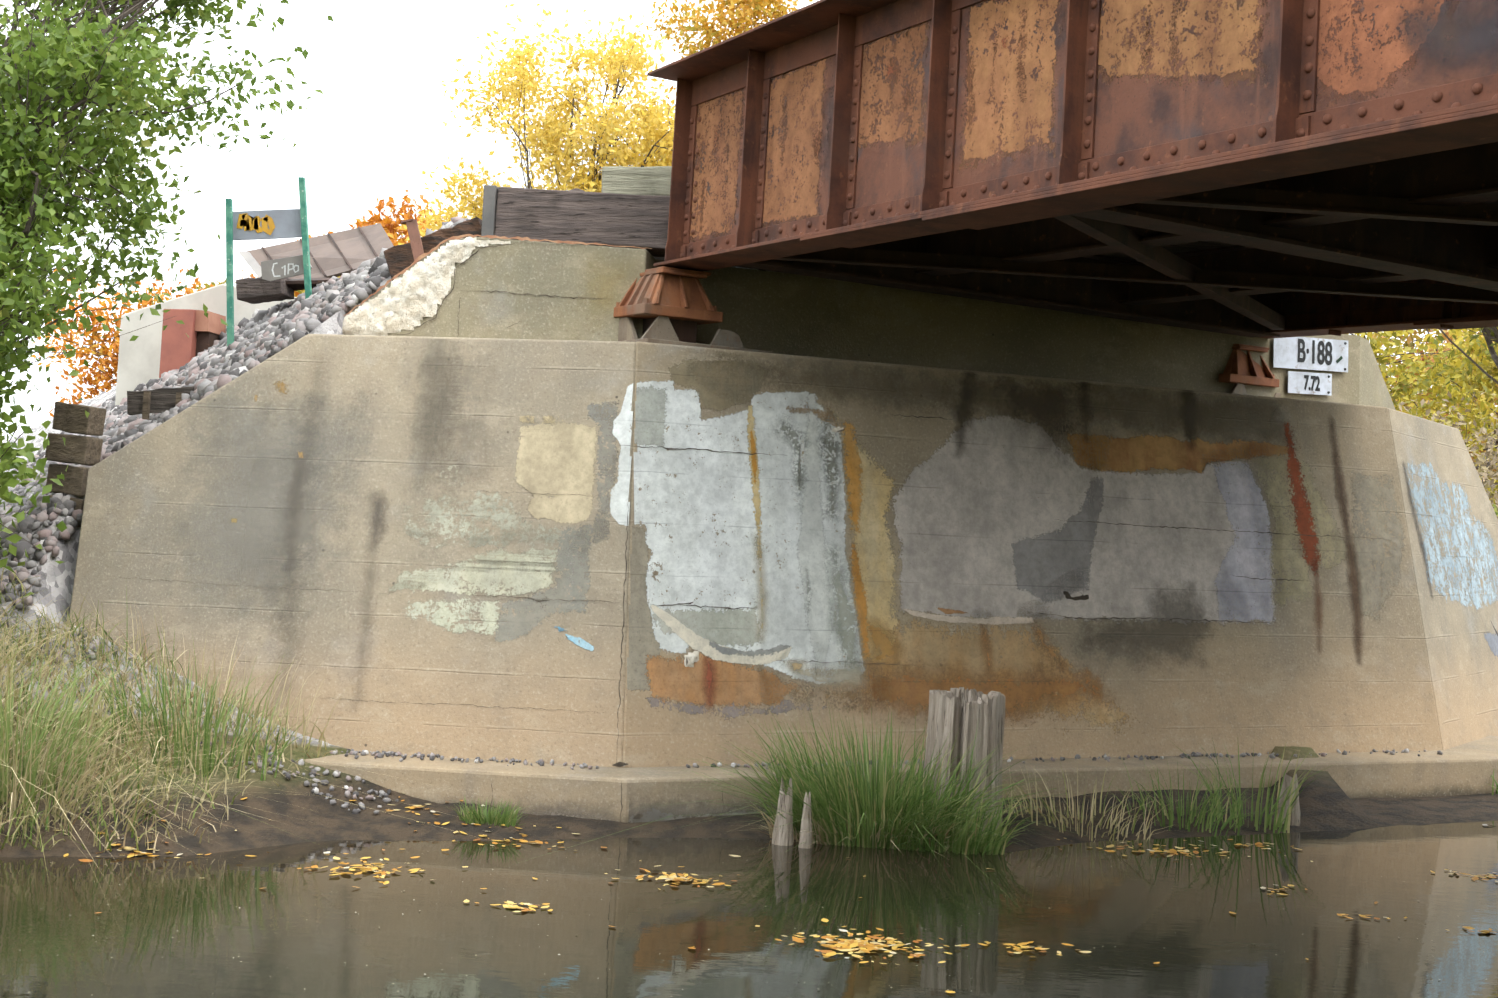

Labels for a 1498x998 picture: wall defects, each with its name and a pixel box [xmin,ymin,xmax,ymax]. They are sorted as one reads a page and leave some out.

corrosion [964,9,1030,136]
corrosion [1140,0,1187,77]
spalling [342,234,651,336]
peeling [389,358,865,691]
corrosion [644,404,1136,735]
corrosion [1065,423,1321,627]